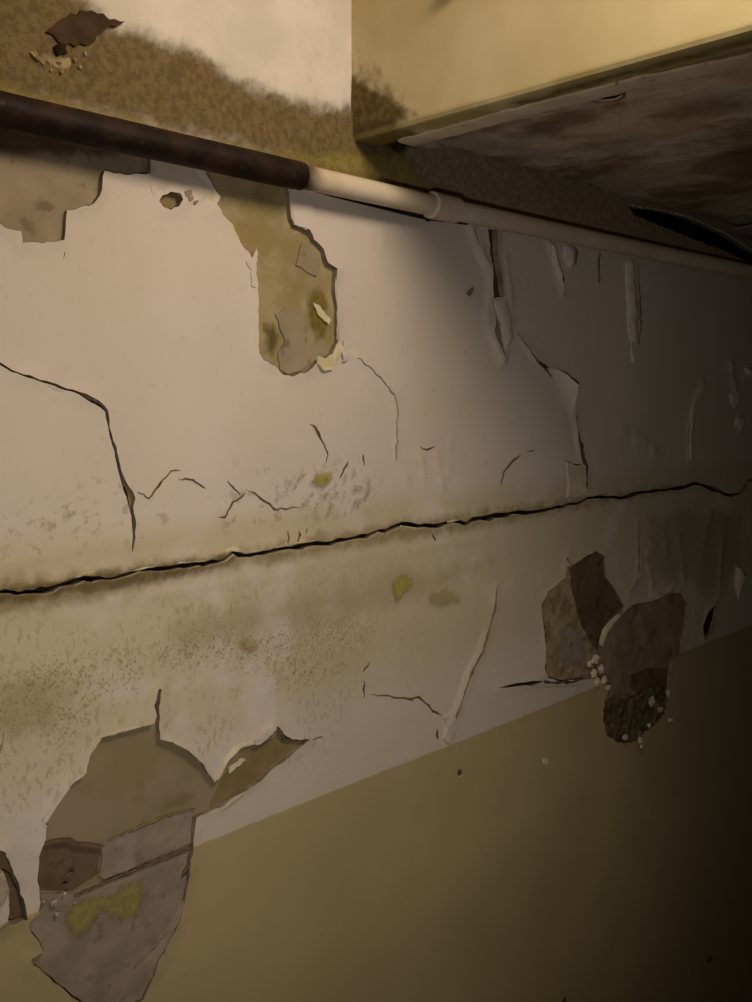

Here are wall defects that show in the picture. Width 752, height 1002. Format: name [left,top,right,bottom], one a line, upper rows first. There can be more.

leakage [0,0,441,193]
spalling [0,127,149,243]
spalling [185,171,354,376]
peeling [473,229,513,351]
peeling [625,259,642,363]
leakage [0,556,245,608]
crack [0,341,752,594]
leakage [342,512,488,544]
crack [362,610,494,745]
spalling [540,552,719,749]
spalling [0,723,323,1002]